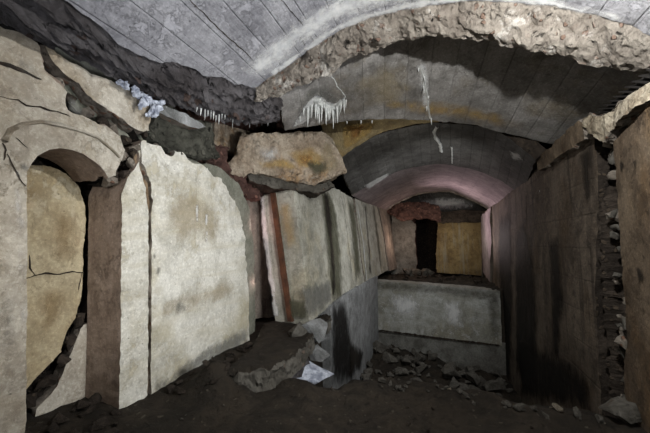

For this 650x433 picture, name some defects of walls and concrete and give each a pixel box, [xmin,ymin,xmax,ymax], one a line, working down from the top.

water stain [294,90,347,129]
efflorescence [418,65,443,153]
crack [0,61,171,408]
rust [270,193,306,322]
water stain [435,215,588,409]